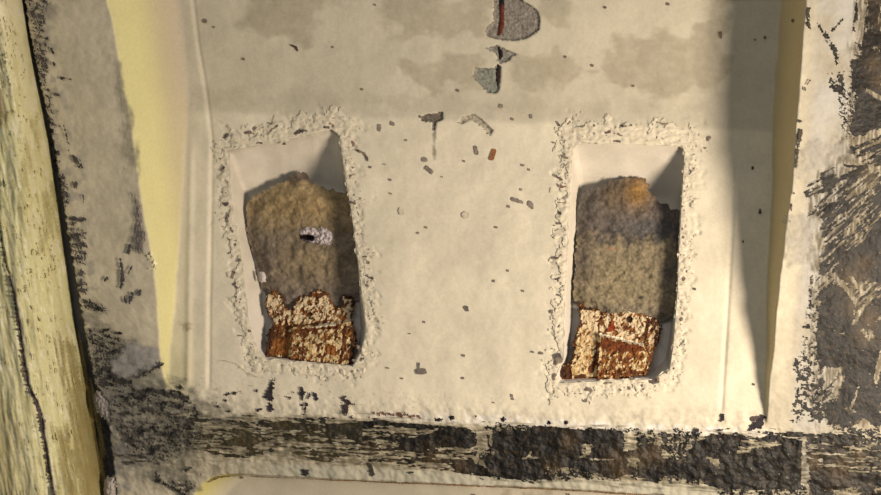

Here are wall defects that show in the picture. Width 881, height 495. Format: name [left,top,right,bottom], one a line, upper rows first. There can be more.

water stain [26,0,84,207]
spalling [418,112,443,131]
spalling [458,114,494,136]
spalling [473,0,541,94]
spalling [794,119,803,168]
peeling [806,7,844,65]
crack [0,225,56,495]
water stain [52,216,227,495]
spalling [211,105,385,394]
spalling [531,111,711,406]